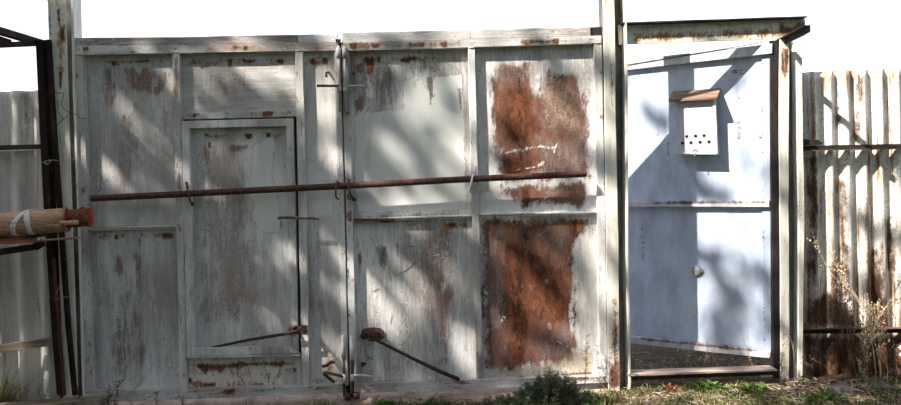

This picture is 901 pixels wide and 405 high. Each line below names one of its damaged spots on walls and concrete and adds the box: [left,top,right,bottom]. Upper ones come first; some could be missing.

rust [47,0,65,88]
rust [633,23,804,77]
rust [805,156,819,285]
rust [804,180,901,377]